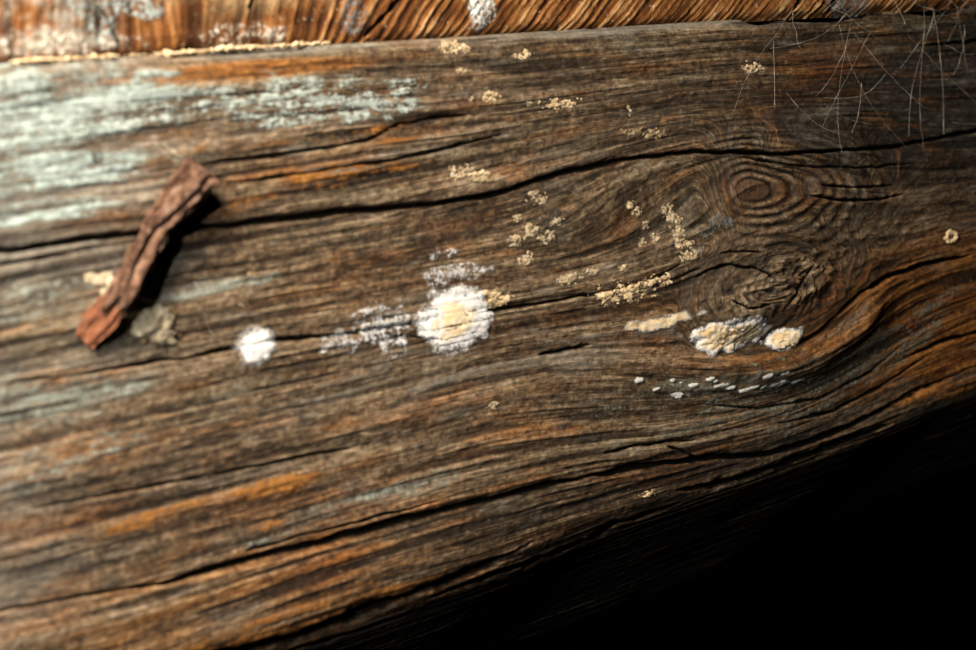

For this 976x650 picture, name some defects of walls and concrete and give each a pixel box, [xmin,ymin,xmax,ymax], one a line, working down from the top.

crack [173,130,976,231]
crack [0,230,140,266]
damp [171,280,240,299]
crack [272,321,424,342]
mould [321,248,494,358]
crack [488,250,775,313]
damp [625,287,961,439]
crack [0,330,976,650]